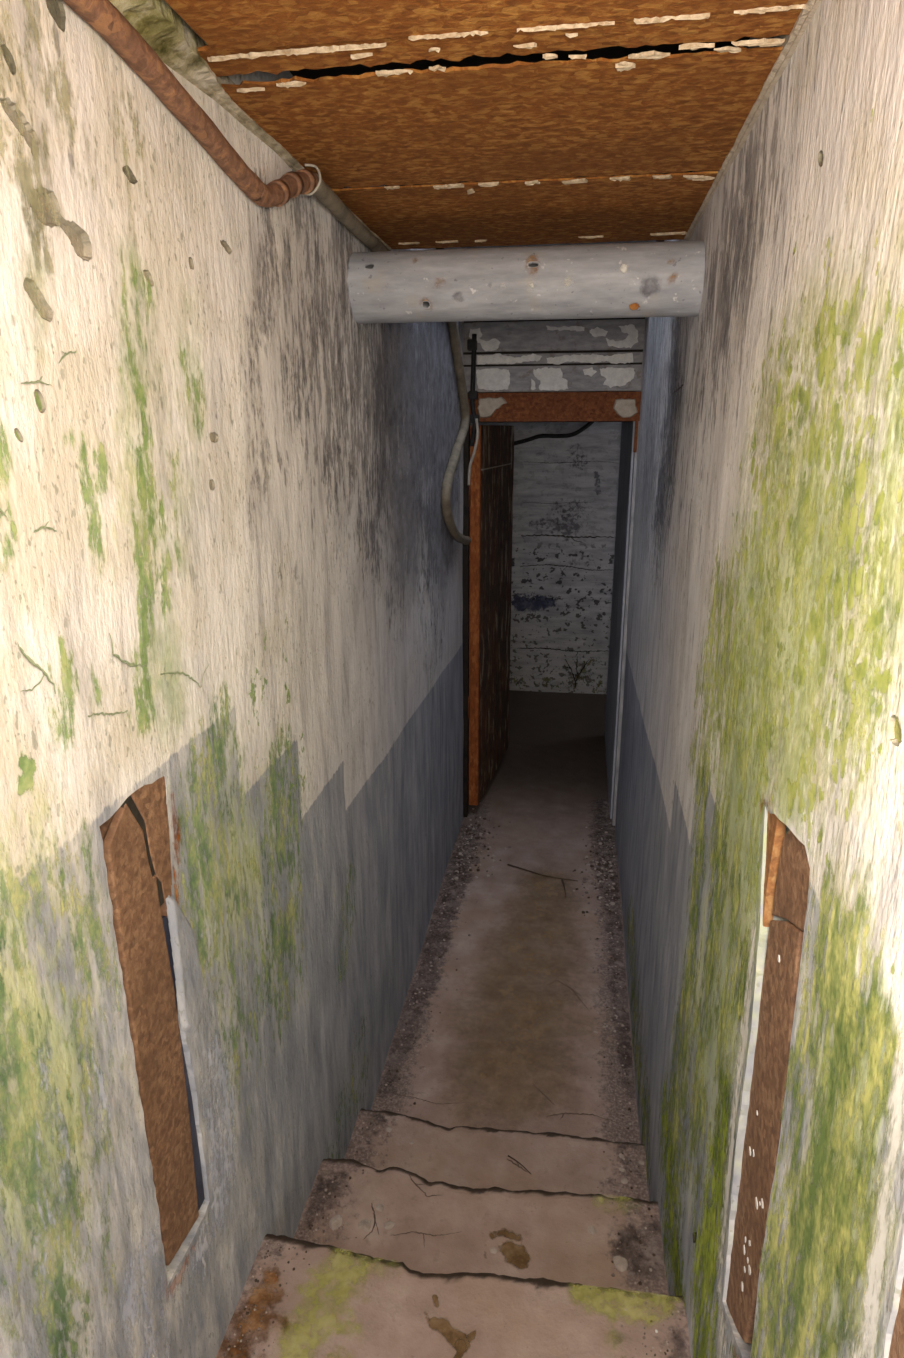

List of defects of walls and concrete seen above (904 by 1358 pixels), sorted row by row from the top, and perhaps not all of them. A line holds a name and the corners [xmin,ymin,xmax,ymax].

peeling [207,43,413,77]
peeling [408,31,488,72]
peeling [513,21,615,60]
peeling [634,13,710,24]
peeling [615,38,785,72]
peeling [469,324,638,391]
water stain [120,265,179,735]
water stain [178,684,304,1274]
water stain [627,553,768,1358]
water stain [0,824,179,1358]
water stain [845,987,904,1358]
crack [364,1203,459,1247]